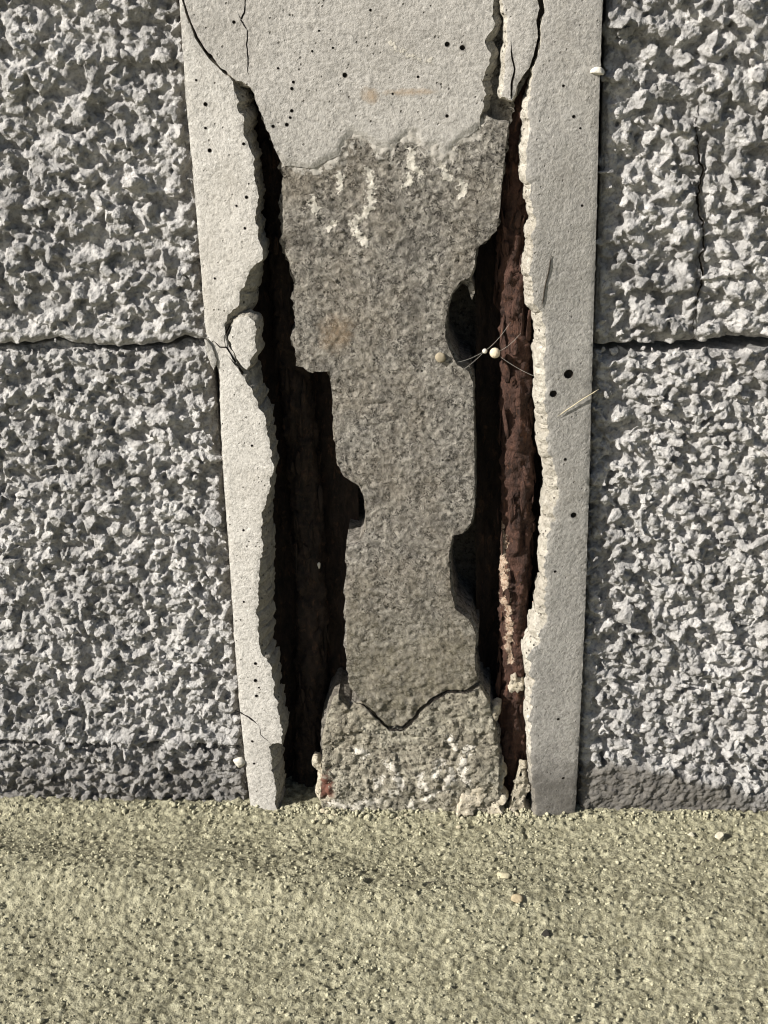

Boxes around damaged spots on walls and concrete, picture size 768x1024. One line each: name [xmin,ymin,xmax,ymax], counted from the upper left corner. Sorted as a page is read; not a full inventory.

crack [184,2,216,62]
crack [238,0,251,81]
crack [510,0,544,96]
corrosion [493,174,525,305]
crack [213,325,244,375]
corrosion [500,301,534,383]
peeling [179,0,603,817]
corrosion [499,406,509,449]
corrosion [494,462,536,717]
crack [352,686,478,731]